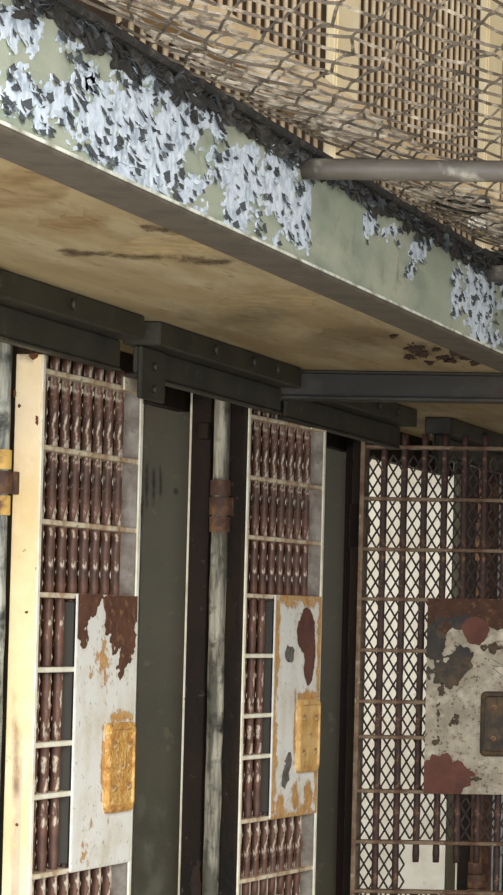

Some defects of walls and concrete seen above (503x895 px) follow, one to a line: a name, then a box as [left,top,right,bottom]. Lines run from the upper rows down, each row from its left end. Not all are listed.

peeling [0,0,503,348]
spalling [403,342,482,366]
corrosion [78,594,138,685]
corrosion [426,598,503,689]
corrosion [271,595,322,819]